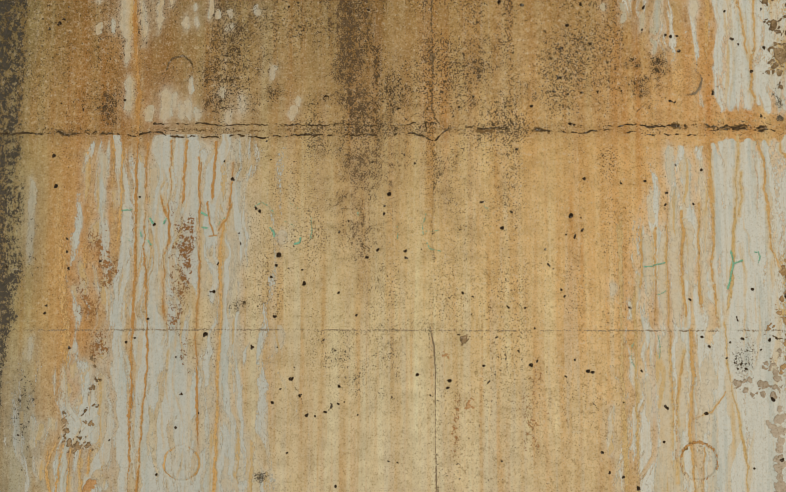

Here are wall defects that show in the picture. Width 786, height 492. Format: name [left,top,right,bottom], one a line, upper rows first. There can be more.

rust [126,0,150,492]
damp [0,0,288,492]
rust [161,197,171,318]
rust [194,141,234,492]
damp [289,96,301,121]
crack [0,101,783,141]
rust [616,203,706,492]
rust [707,134,750,492]
peeling [732,290,786,492]
rust [735,0,786,105]
rust [753,134,786,289]
peeling [763,3,786,90]